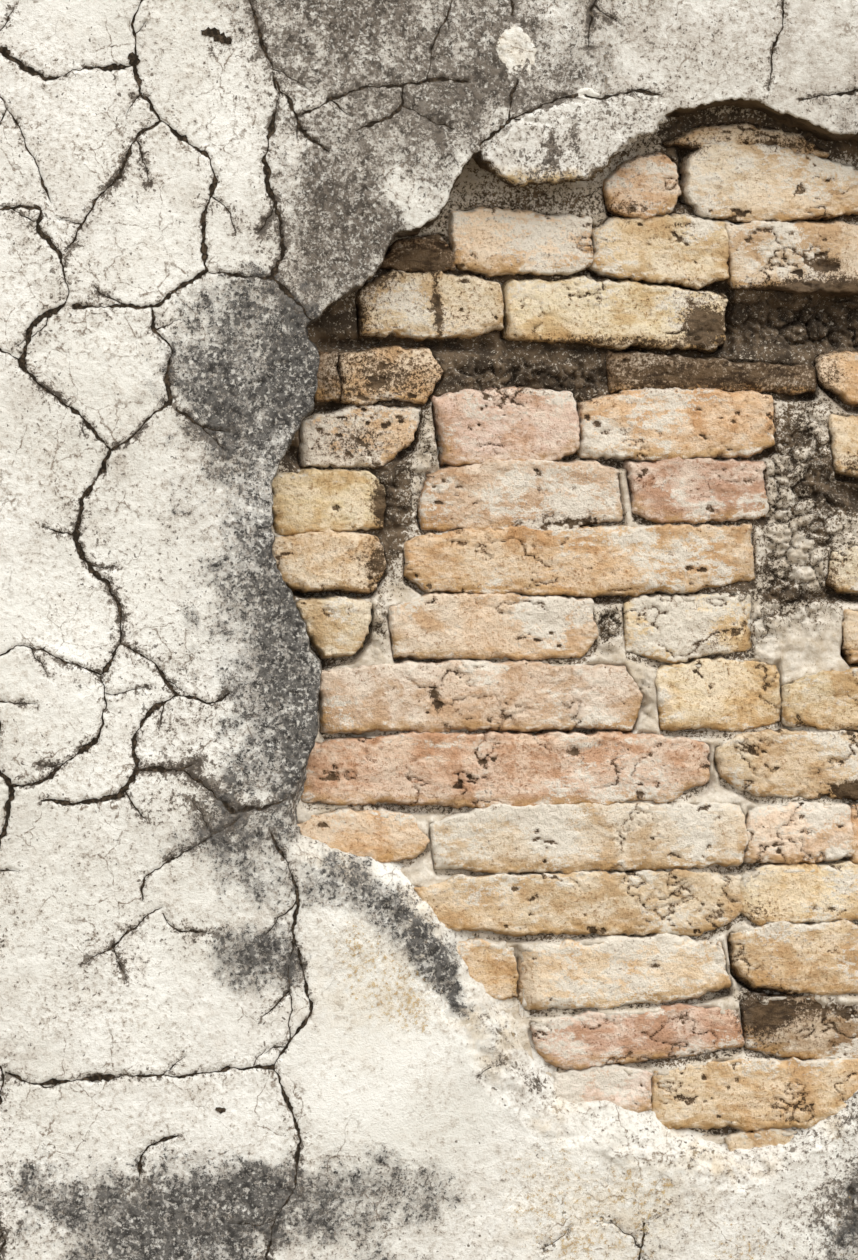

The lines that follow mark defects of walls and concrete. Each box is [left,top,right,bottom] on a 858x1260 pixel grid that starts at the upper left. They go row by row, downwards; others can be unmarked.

crack [588,0,620,46]
crack [768,0,784,91]
crack [479,79,660,146]
crack [799,89,858,101]
water stain [142,0,659,995]
crack [0,0,468,1260]
flaking render [271,88,858,1187]
water stain [6,1140,471,1260]
crack [604,1222,646,1260]